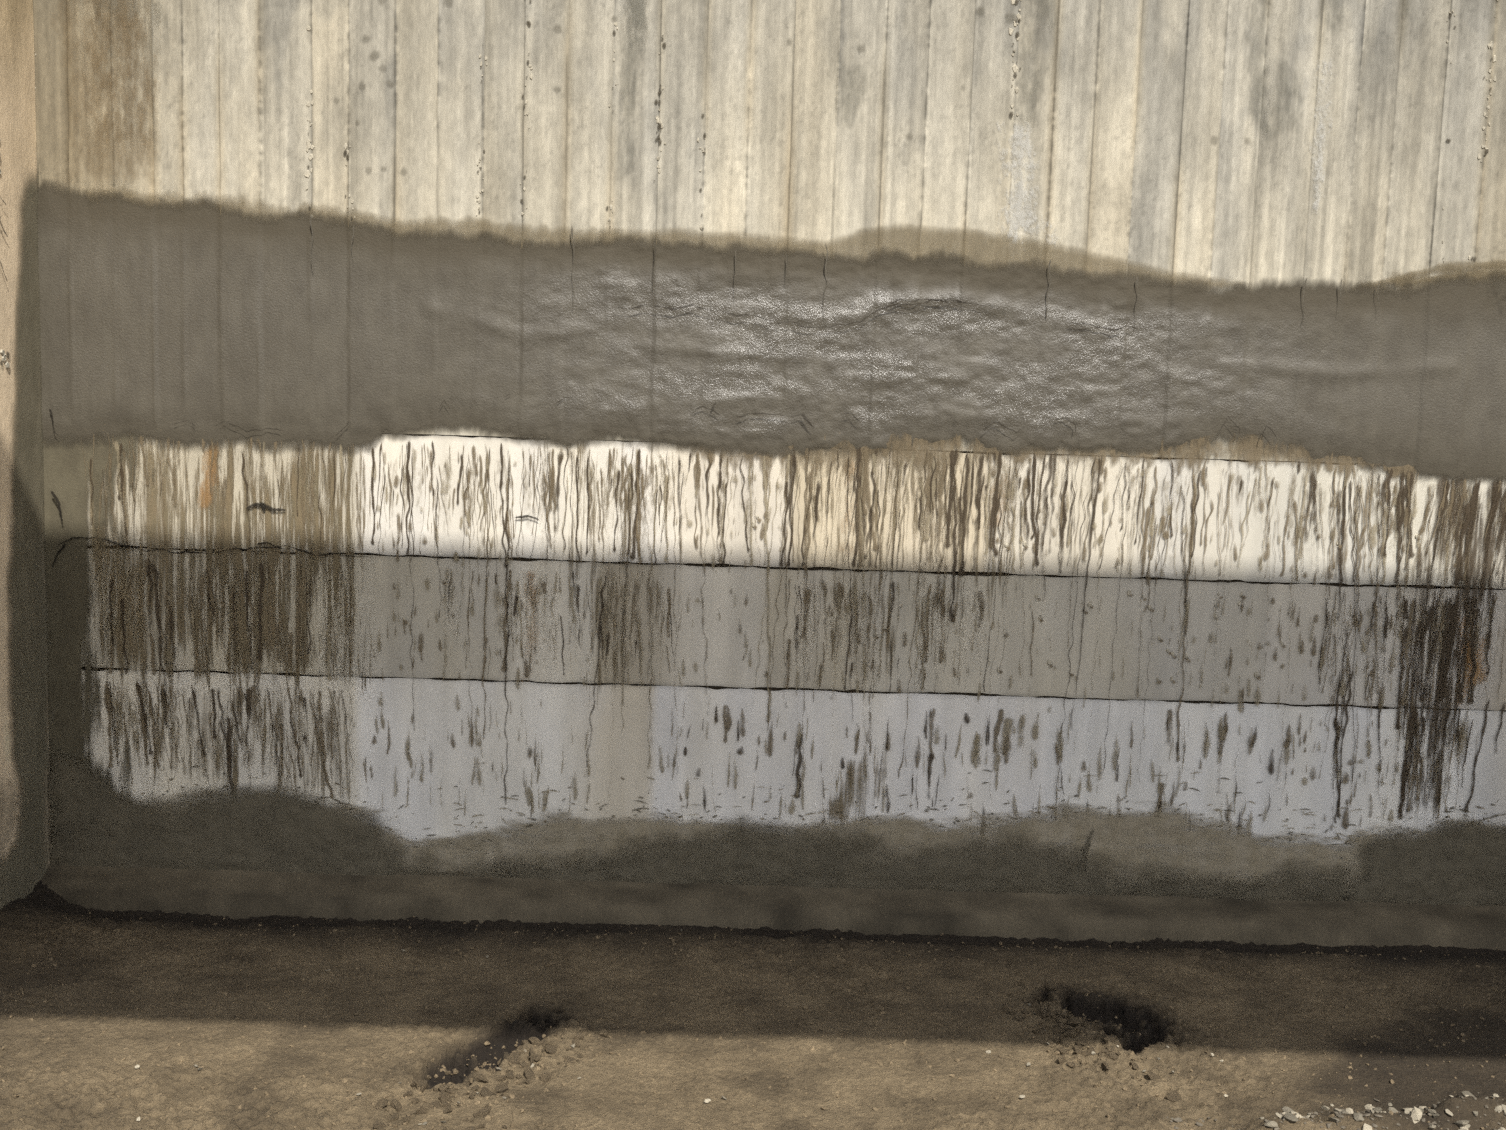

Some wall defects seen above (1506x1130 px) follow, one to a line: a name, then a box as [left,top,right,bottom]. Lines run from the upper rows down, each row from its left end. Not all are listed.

damp [1363,262,1506,287]
crack [617,299,1008,328]
crack [1071,322,1134,331]
damp [81,435,1506,830]